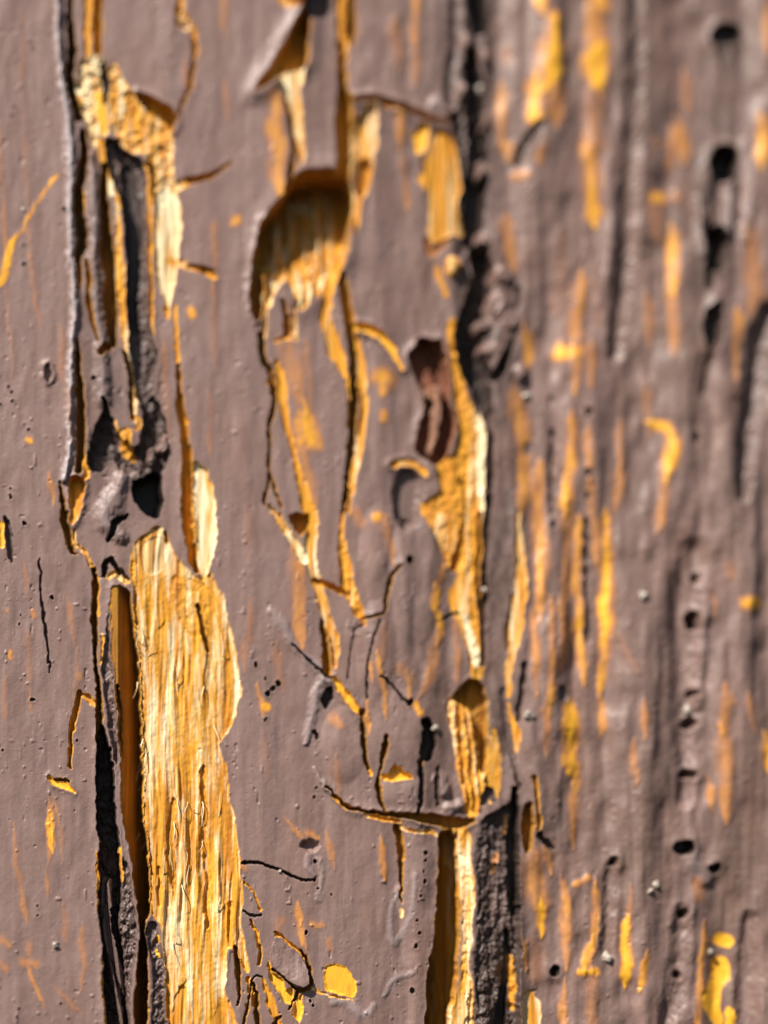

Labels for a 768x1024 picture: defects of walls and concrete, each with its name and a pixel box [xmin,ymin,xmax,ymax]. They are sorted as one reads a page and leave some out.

crack [37,557,53,675]
peeling [58,474,96,569]
peeling [76,0,251,1024]
peeling [248,0,531,1024]
crack [324,562,557,1024]
peeling [701,931,738,1024]